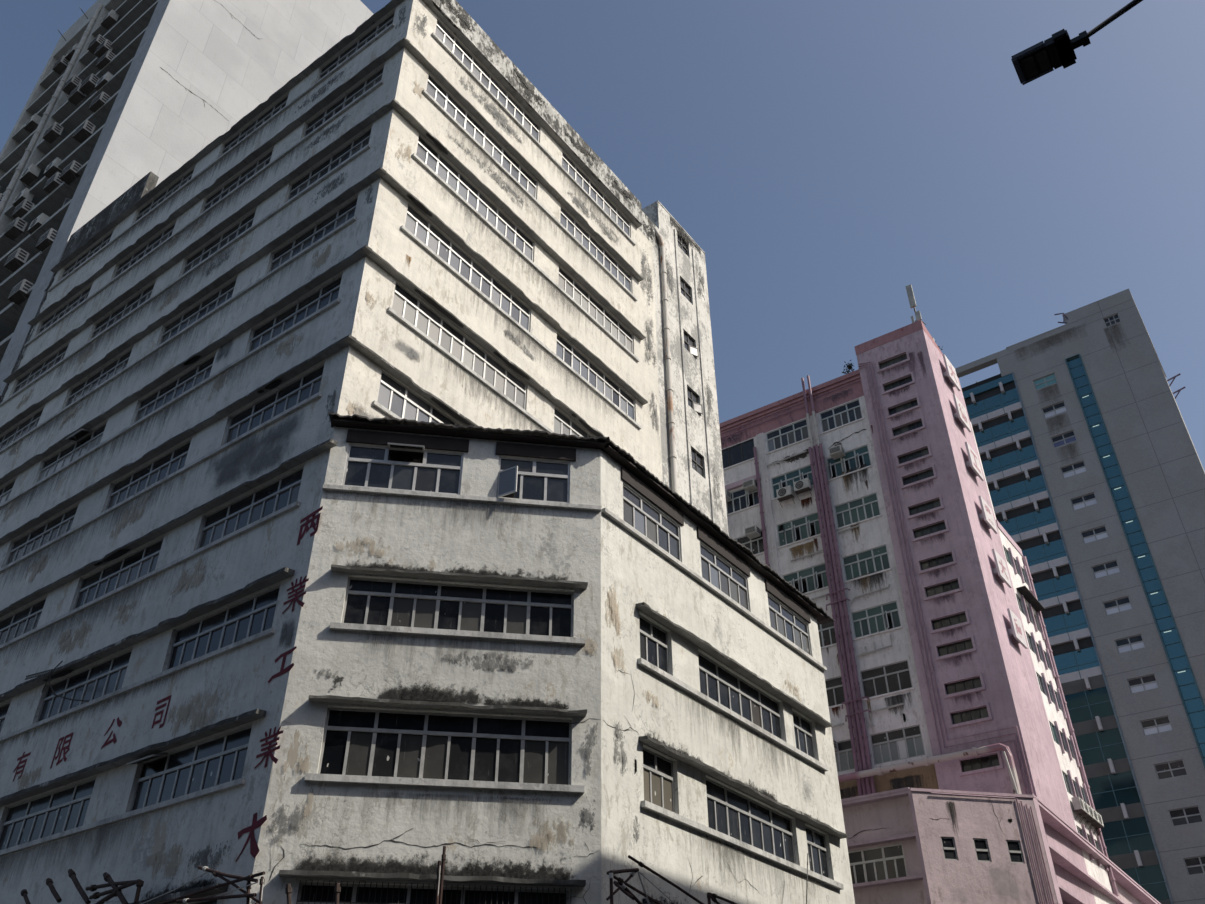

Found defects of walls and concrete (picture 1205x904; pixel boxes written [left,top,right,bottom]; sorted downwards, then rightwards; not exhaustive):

leakage [442,0,474,34]
crack [160,67,226,119]
leakage [513,69,545,105]
leakage [565,131,597,165]
leakage [611,175,633,206]
leakage [217,418,296,483]
rust [790,538,818,557]
flaking render [443,649,533,672]
crack [269,828,538,880]